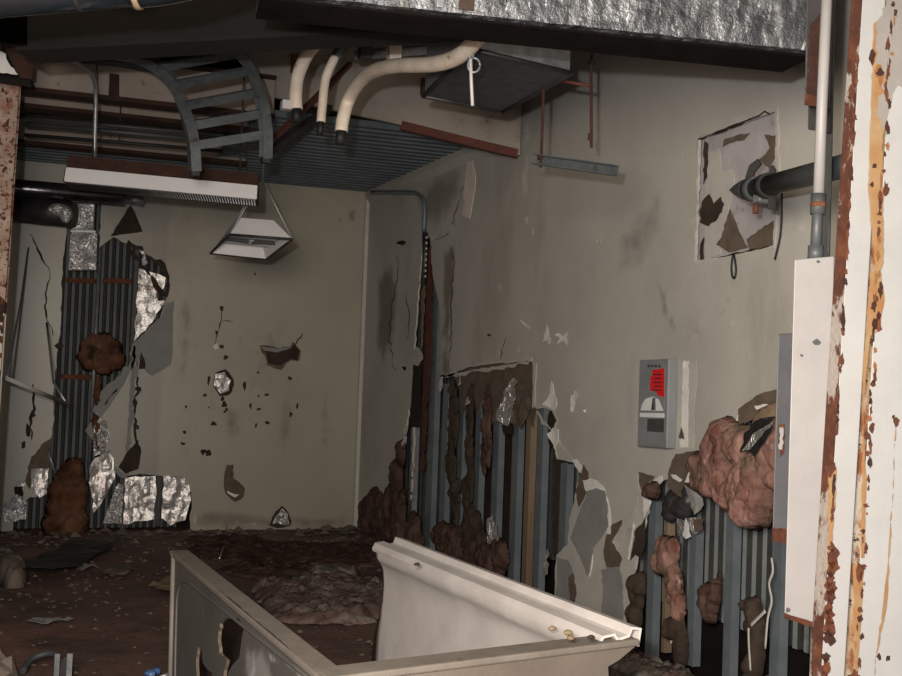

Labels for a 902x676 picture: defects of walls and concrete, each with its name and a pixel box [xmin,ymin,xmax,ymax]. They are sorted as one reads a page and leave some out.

peeling [0,51,21,302]
crack [30,234,53,334]
spalling [85,240,174,453]
spalling [203,330,246,413]
spalling [257,333,303,380]
spalling [440,354,582,473]
rust [784,0,862,676]
rust [847,22,886,676]
peeling [851,0,902,491]
peeling [820,541,840,676]
peeling [854,529,868,676]
rust [875,515,892,673]